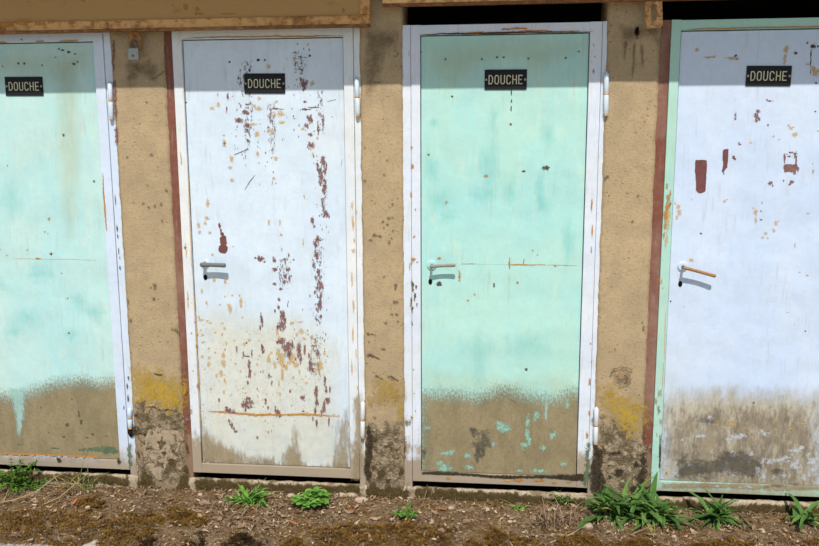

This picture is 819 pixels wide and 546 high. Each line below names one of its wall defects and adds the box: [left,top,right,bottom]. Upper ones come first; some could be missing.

corrosion [0,4,371,43]
corrosion [382,0,700,8]
corrosion [180,153,211,267]
corrosion [187,289,339,429]
water stain [10,389,24,433]
water stain [363,426,404,483]
peeling [437,449,454,472]
water stain [470,428,491,462]
water stain [422,445,624,496]
peeling [520,411,556,450]
water stain [629,453,648,493]
water stain [679,452,755,478]